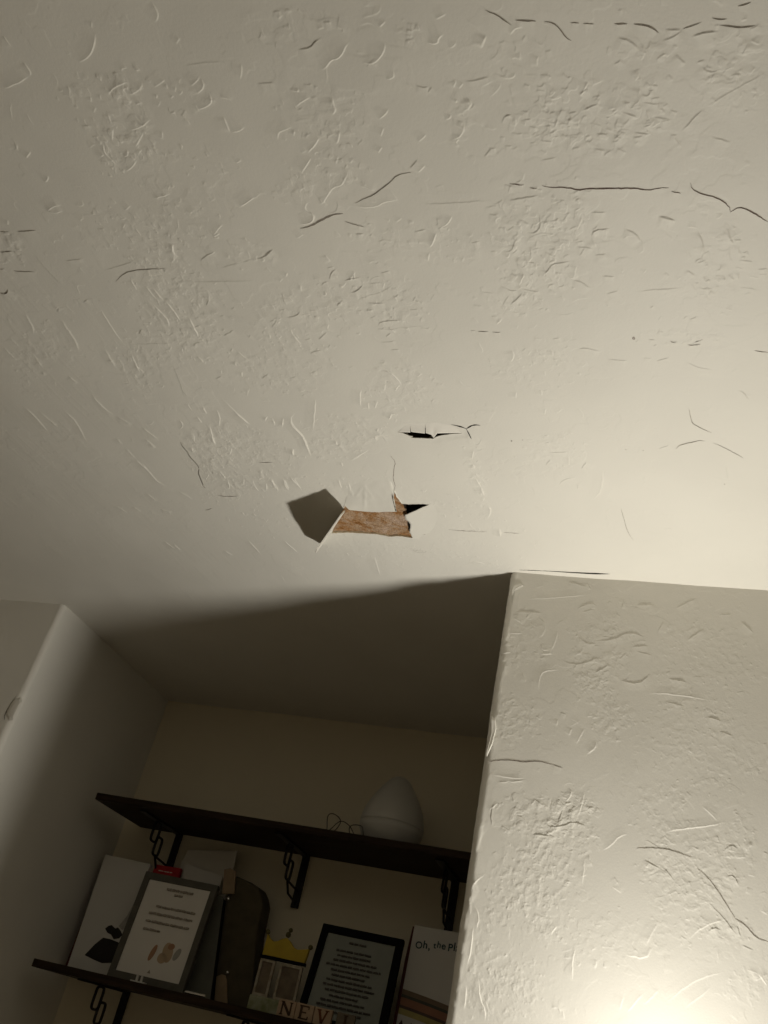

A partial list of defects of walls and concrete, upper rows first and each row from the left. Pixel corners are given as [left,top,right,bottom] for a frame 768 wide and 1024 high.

crack [489,12,588,41]
crack [684,2,752,29]
crack [513,184,766,221]
peeling [345,477,437,539]